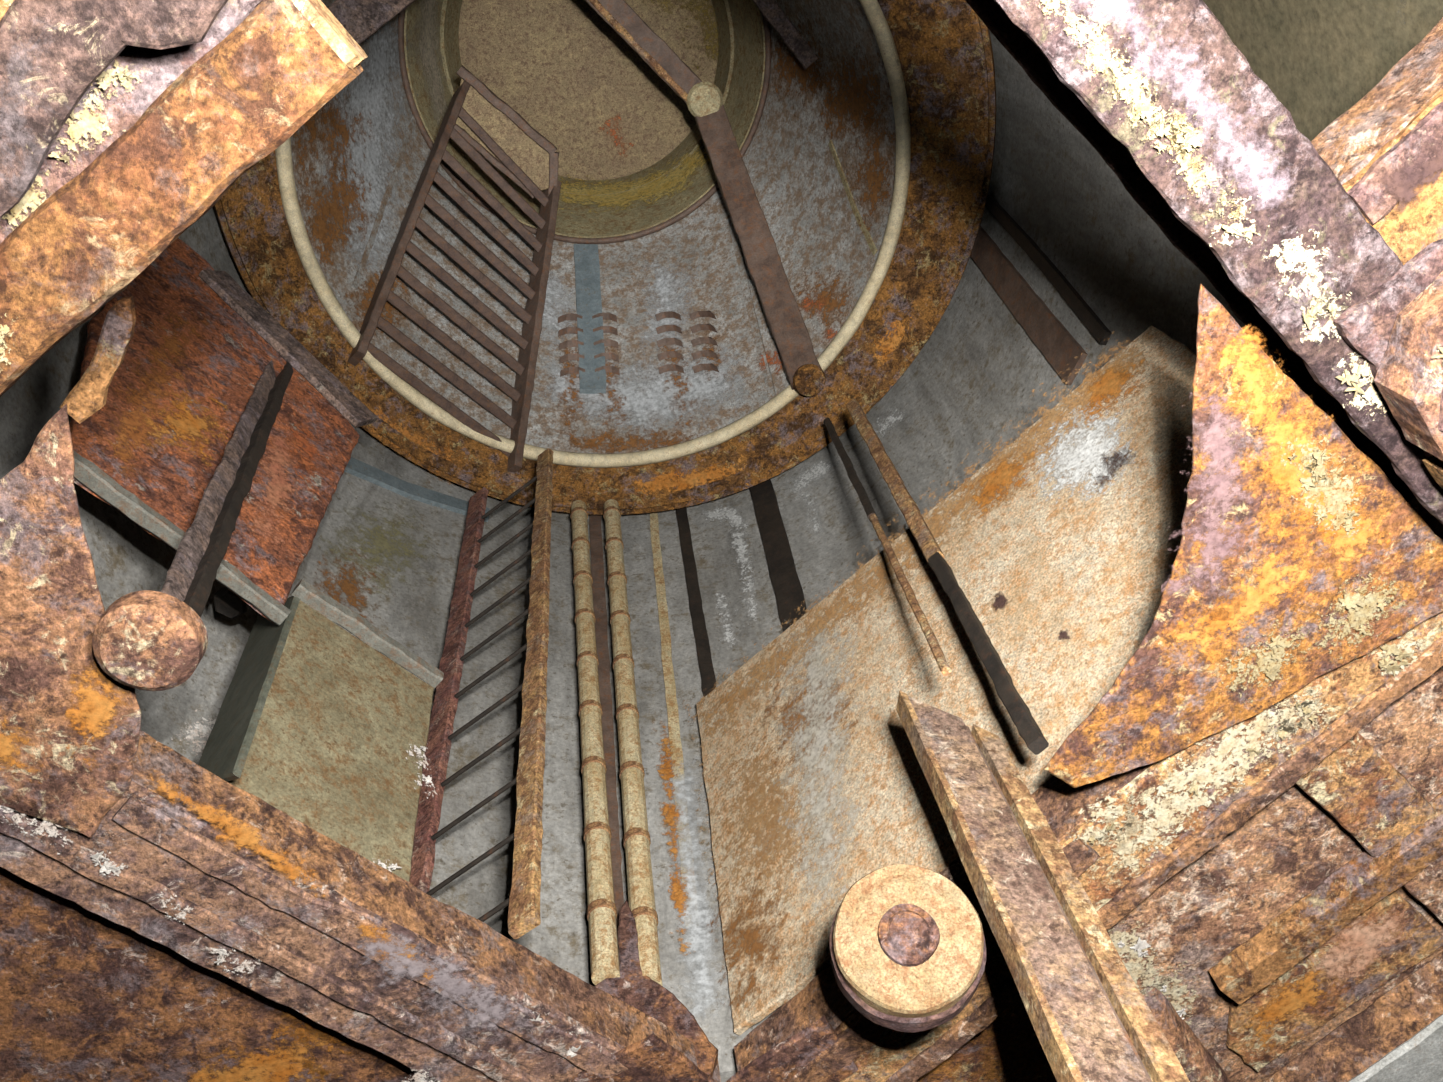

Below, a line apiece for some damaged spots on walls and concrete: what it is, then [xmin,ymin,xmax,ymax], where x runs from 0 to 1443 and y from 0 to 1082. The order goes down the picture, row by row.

corrosion [292,97,372,271]
corrosion [558,338,722,454]
corrosion [867,317,912,366]
corrosion [249,423,326,545]
corrosion [628,454,749,502]
corrosion [1162,326,1390,670]
corrosion [65,663,125,765]
corrosion [682,335,1152,1007]
corrosion [152,774,325,897]
corrosion [657,725,688,955]
corrosion [357,924,513,1030]
corrosion [188,1008,369,1082]